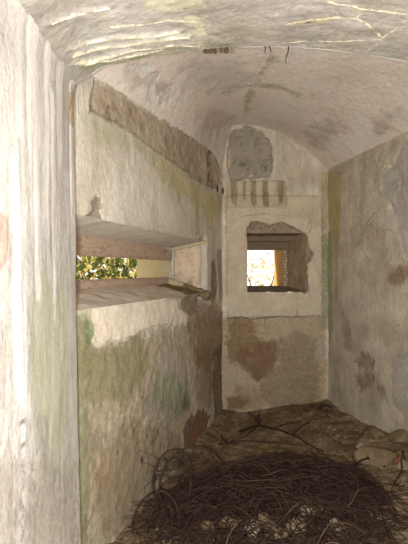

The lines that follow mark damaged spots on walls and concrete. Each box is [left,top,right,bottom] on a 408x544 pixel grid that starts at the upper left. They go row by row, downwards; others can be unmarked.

crack [294,1,408,39]
spalling [227,125,273,181]
peeling [225,195,323,318]
damp [181,251,284,419]